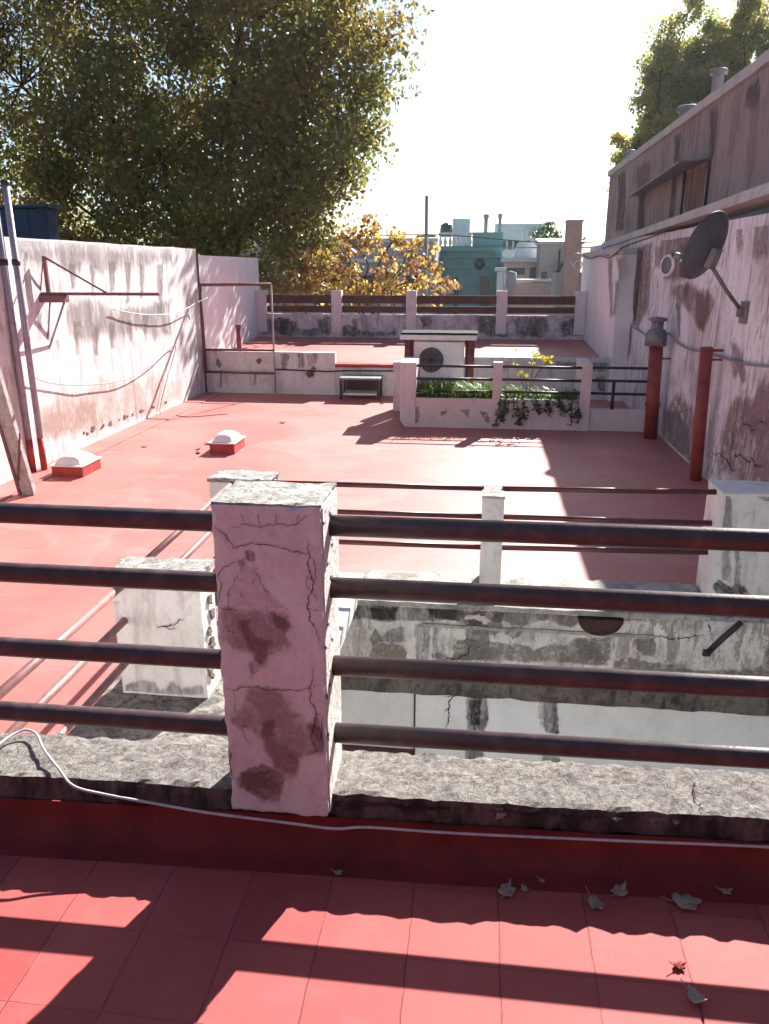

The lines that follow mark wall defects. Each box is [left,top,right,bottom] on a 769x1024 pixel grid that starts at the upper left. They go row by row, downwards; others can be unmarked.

water stain [709,81,760,182]
water stain [616,163,650,231]
water stain [736,225,768,259]
water stain [17,240,172,354]
water stain [263,317,330,336]
water stain [343,320,395,336]
water stain [608,244,652,353]
crack [711,419,767,471]
water stain [719,378,769,482]
crack [214,513,319,637]
water stain [227,608,289,673]
water stain [234,689,323,800]